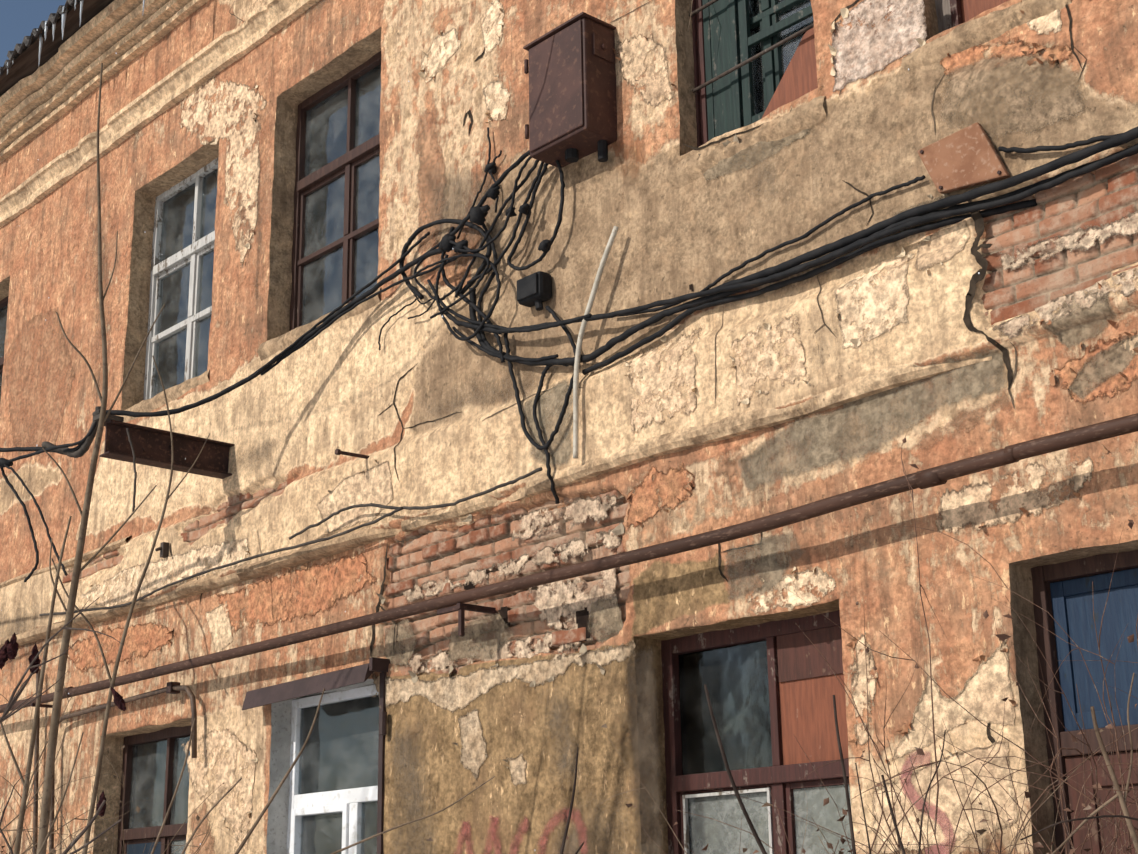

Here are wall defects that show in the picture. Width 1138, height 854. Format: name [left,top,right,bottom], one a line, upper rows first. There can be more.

peeling [828,0,927,92]
crack [1065,4,1087,82]
peeling [174,77,267,267]
spalling [833,153,1138,404]
crack [963,200,1017,409]
damp [741,352,1004,490]
peeling [935,444,1108,534]
spalling [205,460,695,780]
peeling [503,753,527,785]
damp [628,654,661,854]
peeling [846,632,878,745]
peeling [871,639,1018,854]